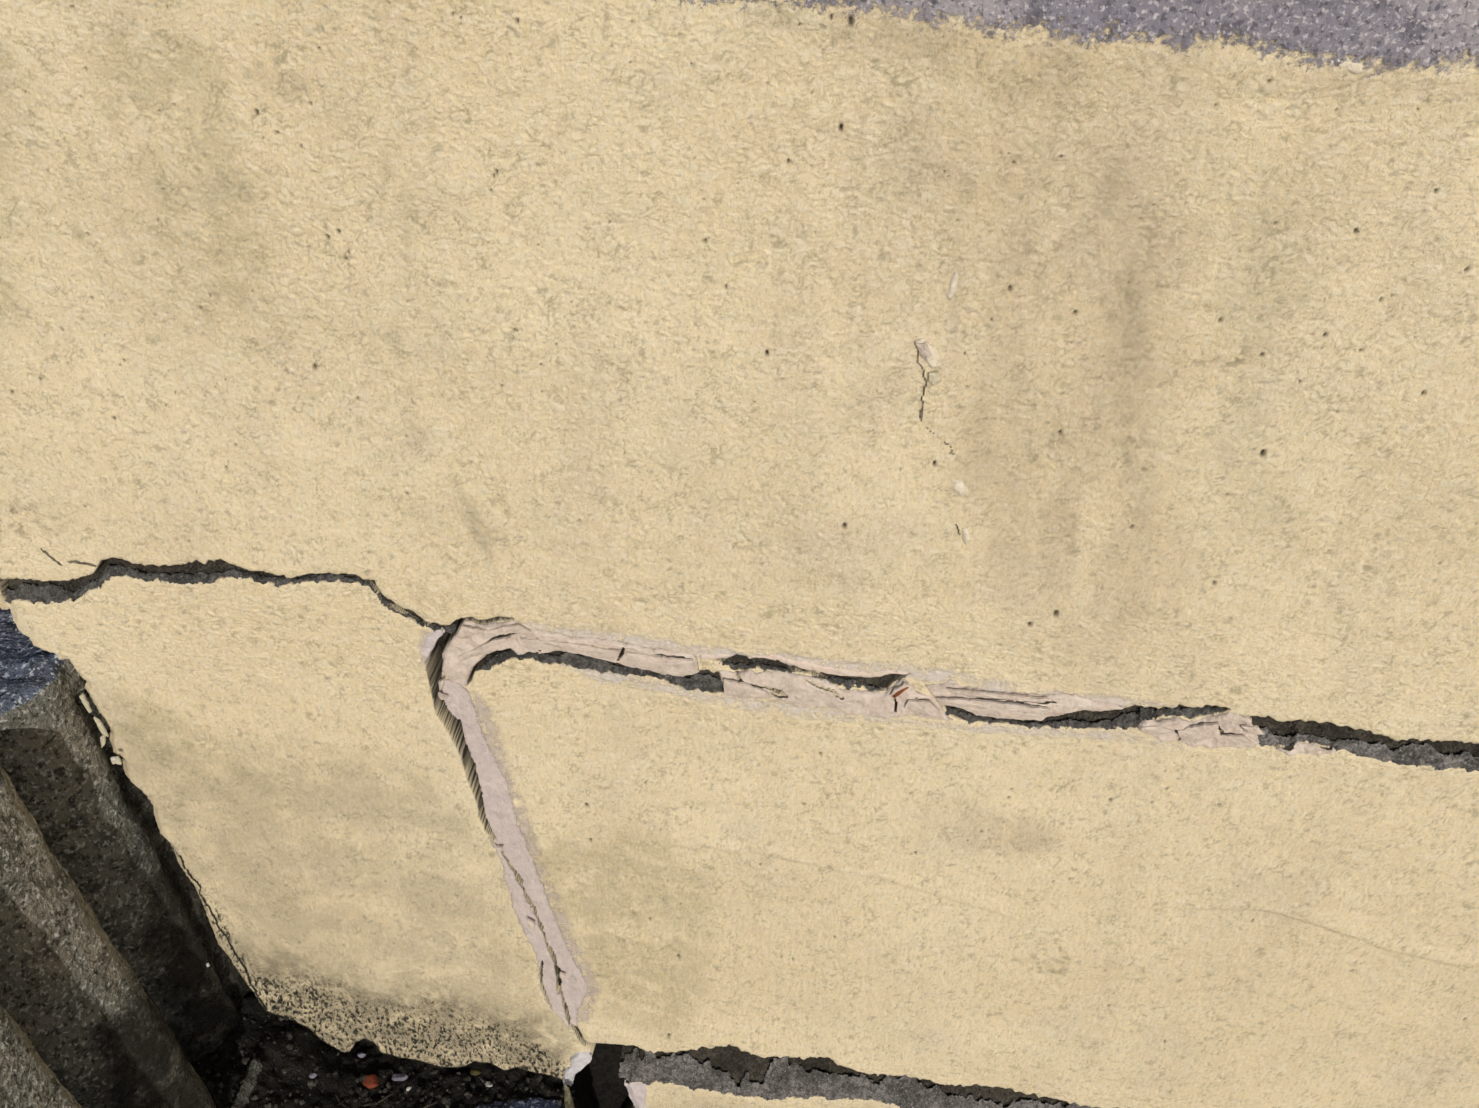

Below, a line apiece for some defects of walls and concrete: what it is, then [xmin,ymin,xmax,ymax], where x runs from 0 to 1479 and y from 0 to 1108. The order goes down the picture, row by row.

crack [4,548,459,652]
crack [467,637,906,708]
peeling [438,619,1337,757]
crack [945,703,1479,772]
crack [172,846,267,1011]
crack [542,954,582,1037]
crack [618,1044,1118,1108]